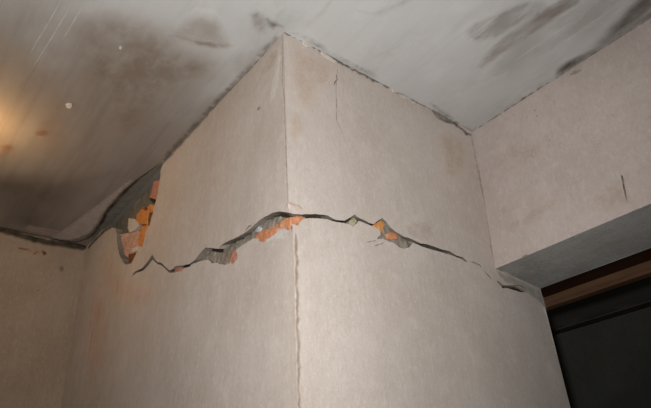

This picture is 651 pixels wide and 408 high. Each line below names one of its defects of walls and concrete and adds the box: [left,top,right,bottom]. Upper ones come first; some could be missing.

leakage [477,0,579,60]
leakage [92,38,199,127]
crack [0,0,651,252]
leakage [0,181,131,240]
spalling [116,177,160,264]
crack [174,214,323,408]
crack [469,261,545,306]